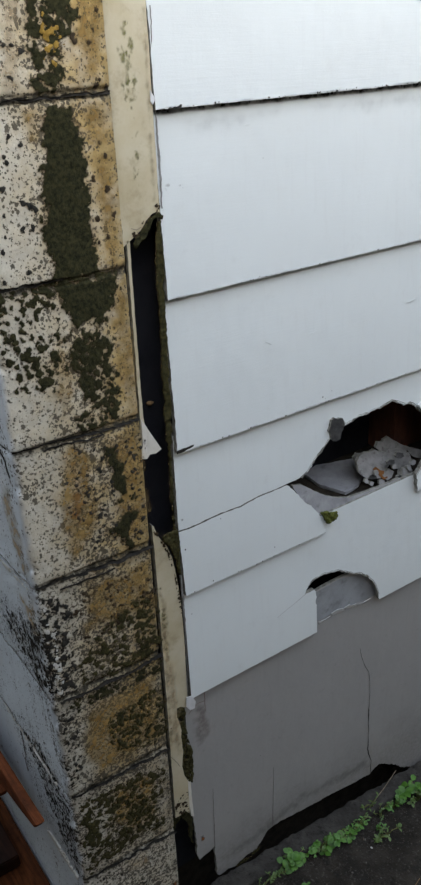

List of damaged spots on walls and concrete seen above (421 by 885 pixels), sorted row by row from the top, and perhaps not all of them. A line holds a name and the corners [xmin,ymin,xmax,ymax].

leakage [117,436,146,536]
peeling [140,419,161,459]
leakage [0,597,65,704]
leakage [86,681,156,769]
crack [360,650,371,773]
leakage [13,710,87,882]